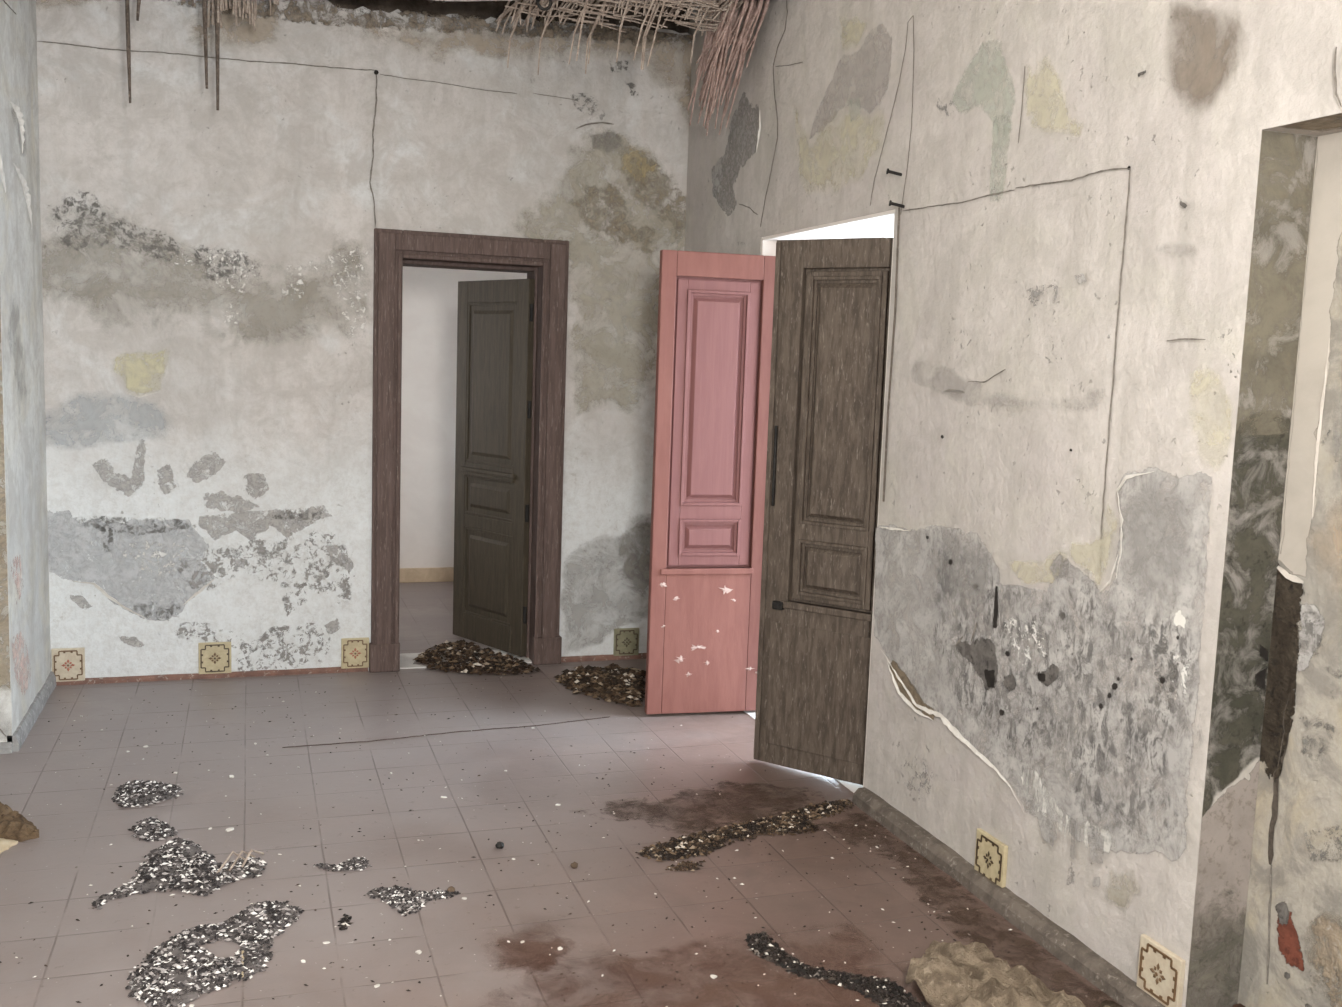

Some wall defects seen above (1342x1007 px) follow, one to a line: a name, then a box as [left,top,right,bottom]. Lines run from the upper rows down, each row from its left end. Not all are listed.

spalling [179,0,693,45]
leakage [1173,10,1236,102]
peeling [712,92,761,216]
leakage [524,93,687,410]
crack [870,15,1131,575]
leakage [874,113,1342,861]
peeling [48,439,355,671]
leakage [563,519,651,642]
spalling [887,660,935,721]
spalling [956,586,1016,692]
spalling [1037,664,1059,687]
rust [1275,902,1304,979]